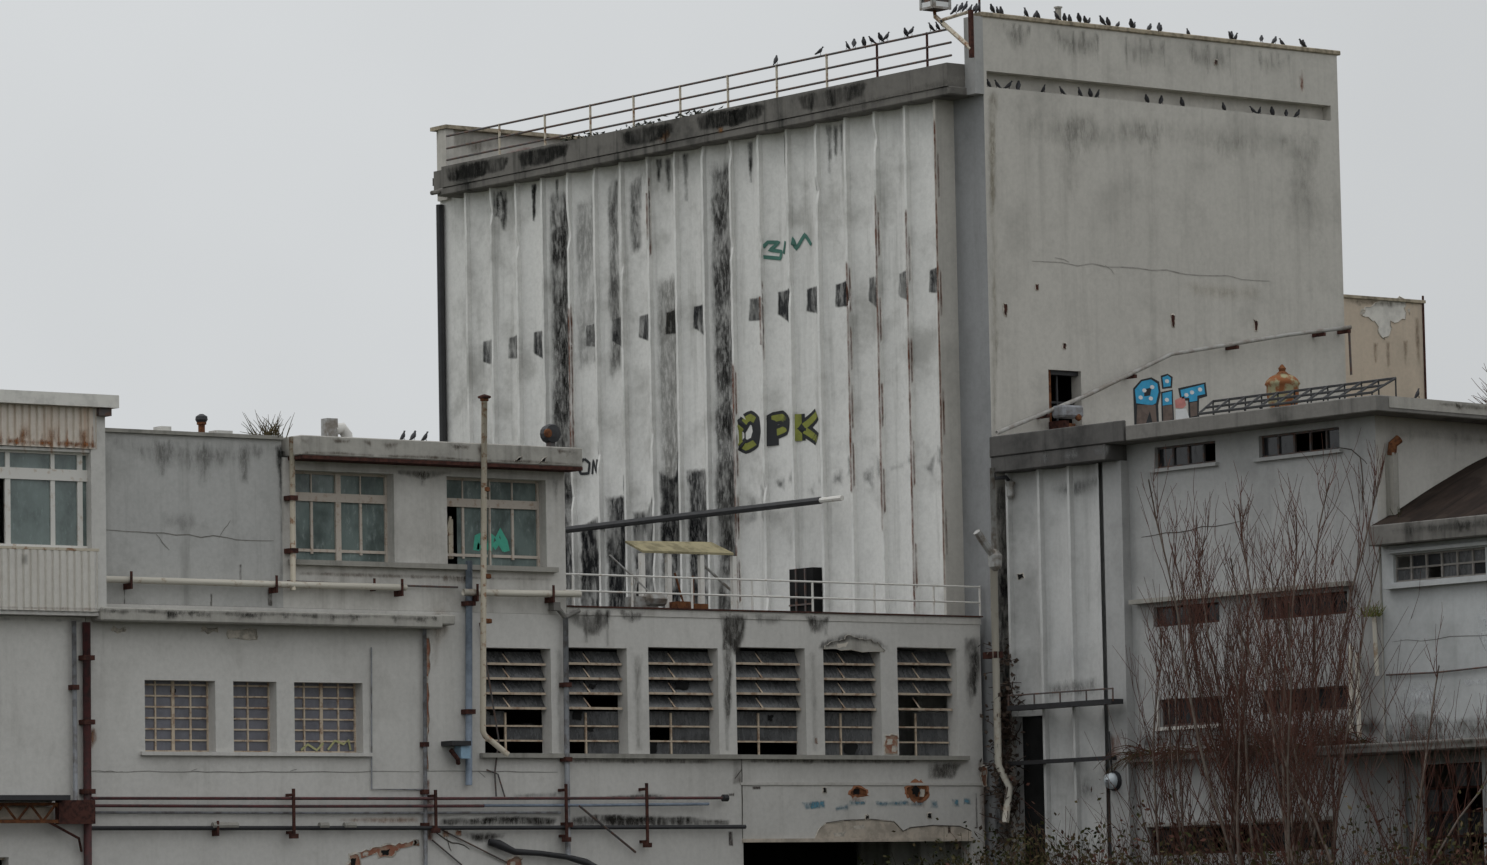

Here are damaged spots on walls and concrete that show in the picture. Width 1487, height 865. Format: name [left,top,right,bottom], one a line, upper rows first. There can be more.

water stain [699,105,762,128]
water stain [448,144,565,181]
water stain [509,180,570,447]
water stain [778,287,817,322]
water stain [835,281,849,306]
water stain [929,268,937,292]
crack [1035,257,1264,281]
peeling [1360,296,1411,340]
water stain [564,166,745,654]
rust [9,431,94,450]
crack [111,522,274,548]
flaking render [815,779,972,838]